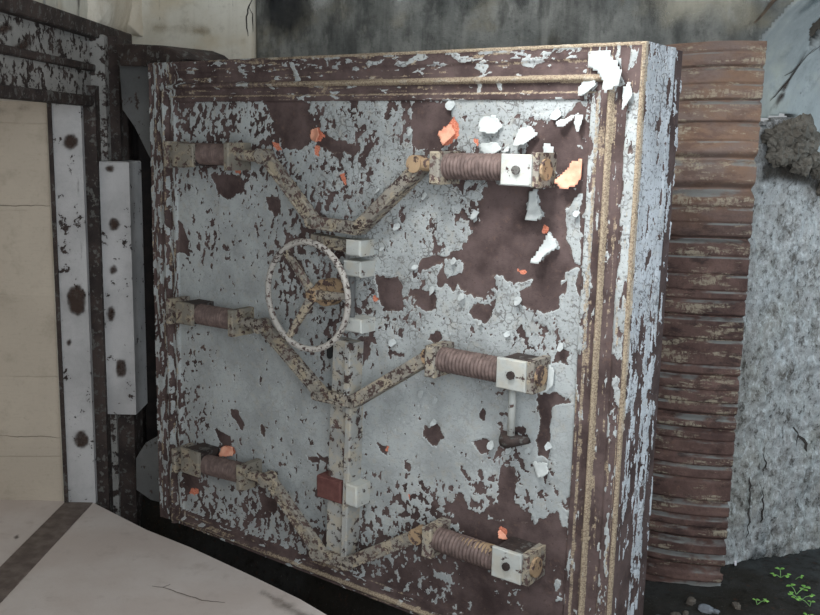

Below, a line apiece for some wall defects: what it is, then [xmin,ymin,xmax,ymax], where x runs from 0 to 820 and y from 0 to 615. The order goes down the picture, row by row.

water stain [269,0,305,32]
peeling [578,50,633,110]
corrosion [64,135,78,149]
peeling [478,115,538,154]
peeling [550,109,583,132]
spalling [761,113,820,196]
peeling [554,159,582,189]
peeling [525,188,545,221]
peeling [530,233,558,264]
corrosion [67,286,85,315]
crack [792,427,808,452]
crack [746,454,767,537]